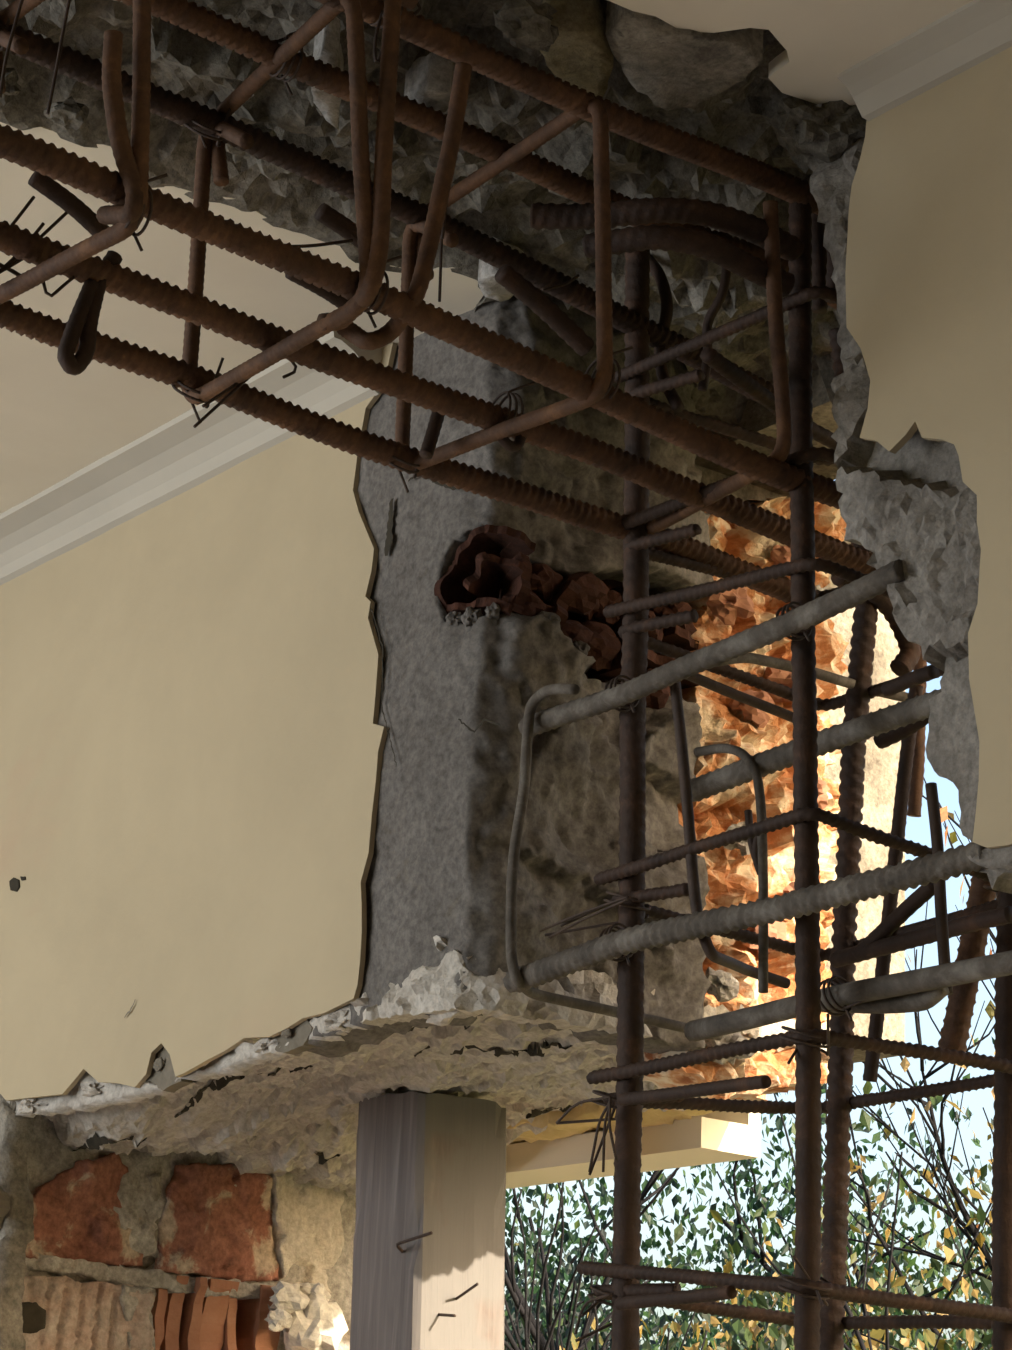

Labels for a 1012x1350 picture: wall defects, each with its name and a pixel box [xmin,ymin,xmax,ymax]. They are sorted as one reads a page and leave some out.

spalling [0,51,111,148]
spalling [17,0,133,75]
spalling [151,12,353,171]
spalling [187,0,324,44]
spalling [148,112,359,263]
spalling [385,217,407,273]
spalling [367,393,625,515]
spalling [391,0,1012,1054]
spalling [0,457,624,1350]
spalling [863,1050,881,1082]